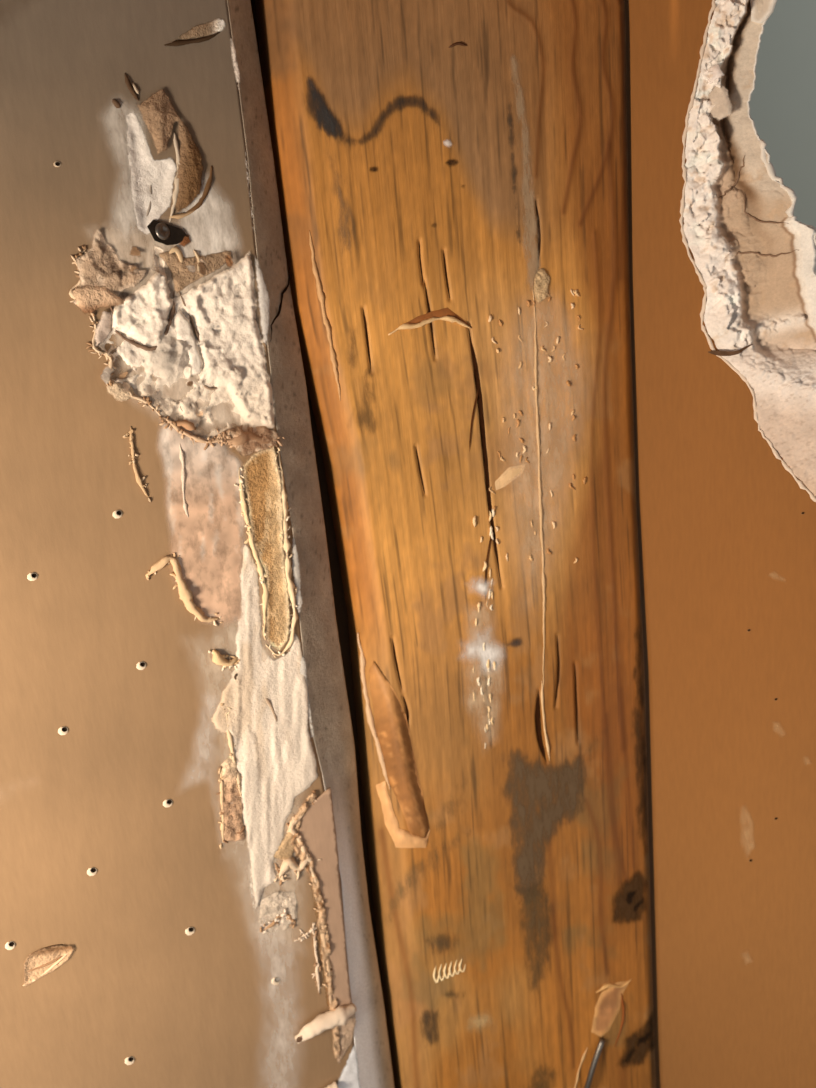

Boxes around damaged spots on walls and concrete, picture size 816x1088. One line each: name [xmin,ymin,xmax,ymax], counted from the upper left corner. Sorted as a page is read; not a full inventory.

leakage [307,79,436,142]
spalling [69,229,275,450]
crack [419,243,450,355]
spalling [679,0,816,502]
crack [468,328,502,599]
spalling [211,539,318,908]
spalling [369,661,430,848]
leakage [505,752,584,986]
peeling [295,1003,357,1044]